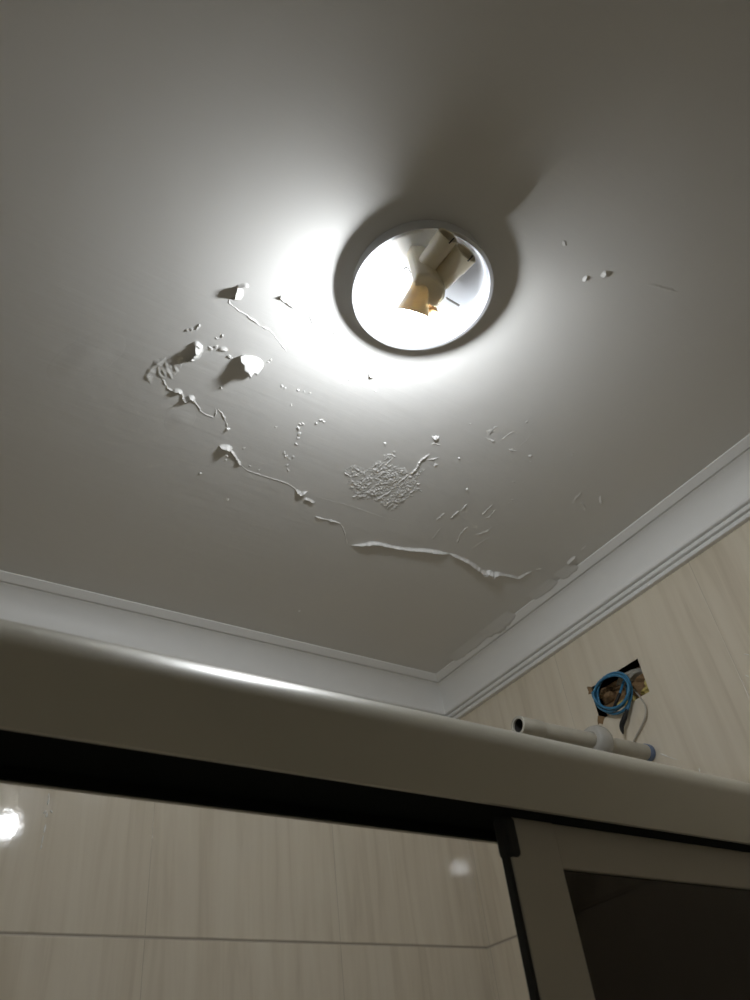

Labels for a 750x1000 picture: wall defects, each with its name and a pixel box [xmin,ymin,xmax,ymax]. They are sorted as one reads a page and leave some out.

peeling [144,324,272,386]
peeling [228,283,287,352]
peeling [219,419,325,503]
peeling [344,436,441,512]